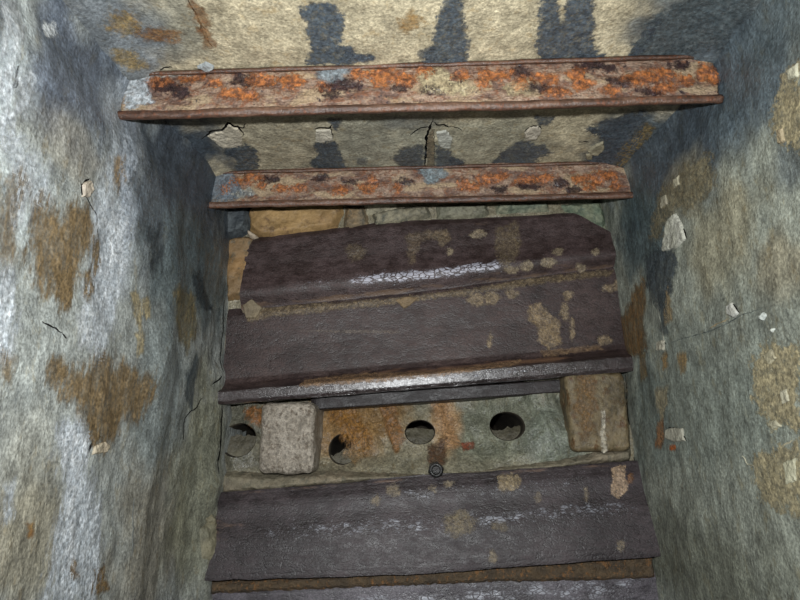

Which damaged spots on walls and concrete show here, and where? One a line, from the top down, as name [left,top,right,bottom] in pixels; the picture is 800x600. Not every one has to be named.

damp [345,50,374,61]
damp [417,47,435,60]
rust [114,48,332,102]
rust [346,67,435,89]
rust [450,62,719,97]
crack [202,122,245,149]
crack [412,118,461,167]
rust [456,172,553,193]
peeling [649,152,717,252]
rust [327,409,373,464]
rust [428,403,474,465]
spalling [664,427,687,450]